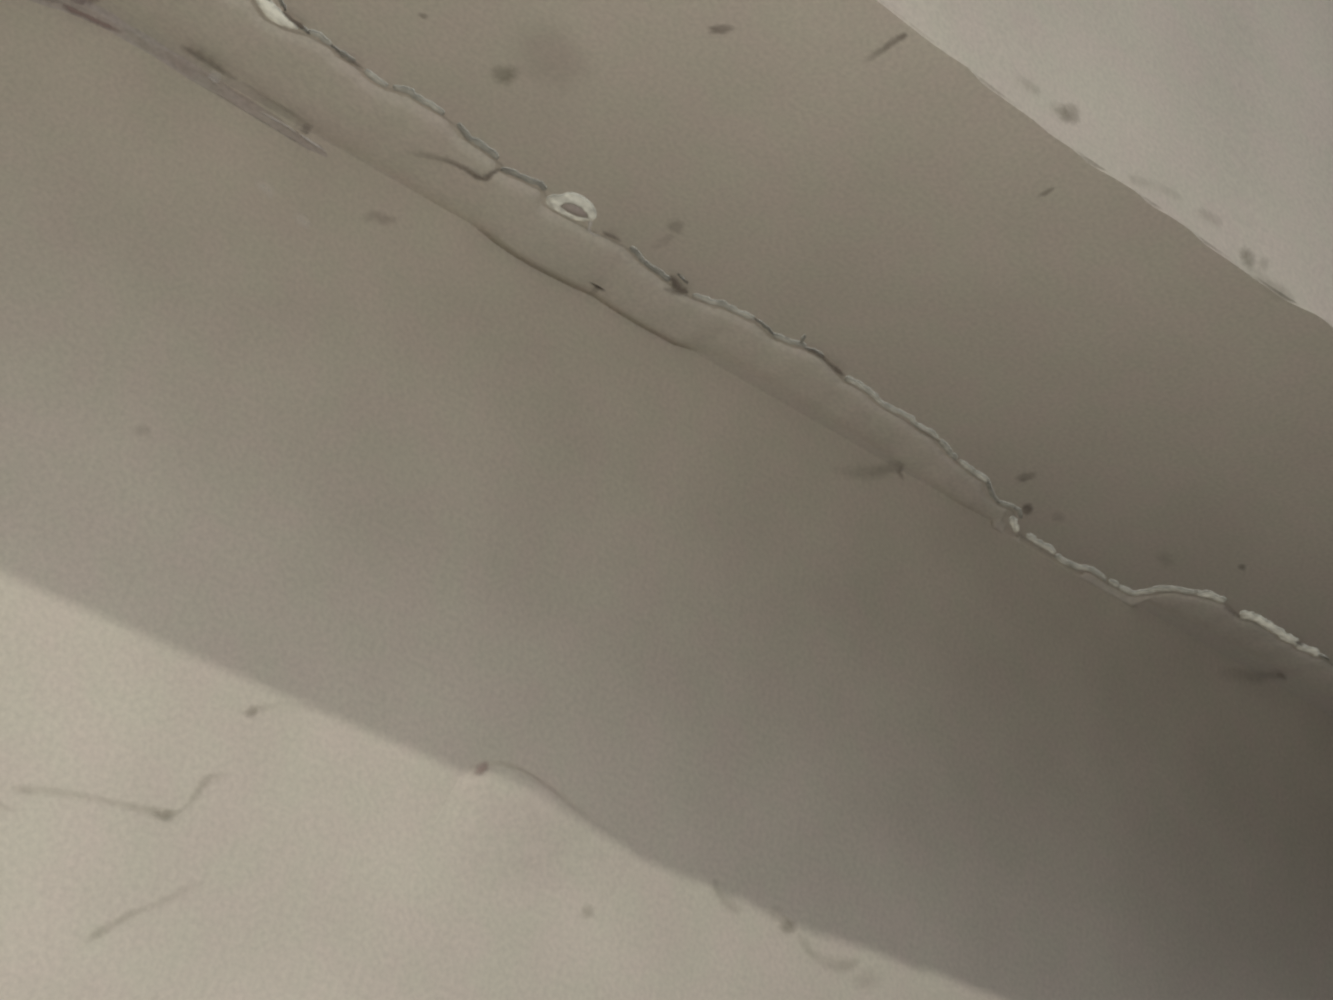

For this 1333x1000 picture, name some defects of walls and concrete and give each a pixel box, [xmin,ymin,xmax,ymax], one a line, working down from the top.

crack [256,0,547,191]
crack [606,233,1329,661]